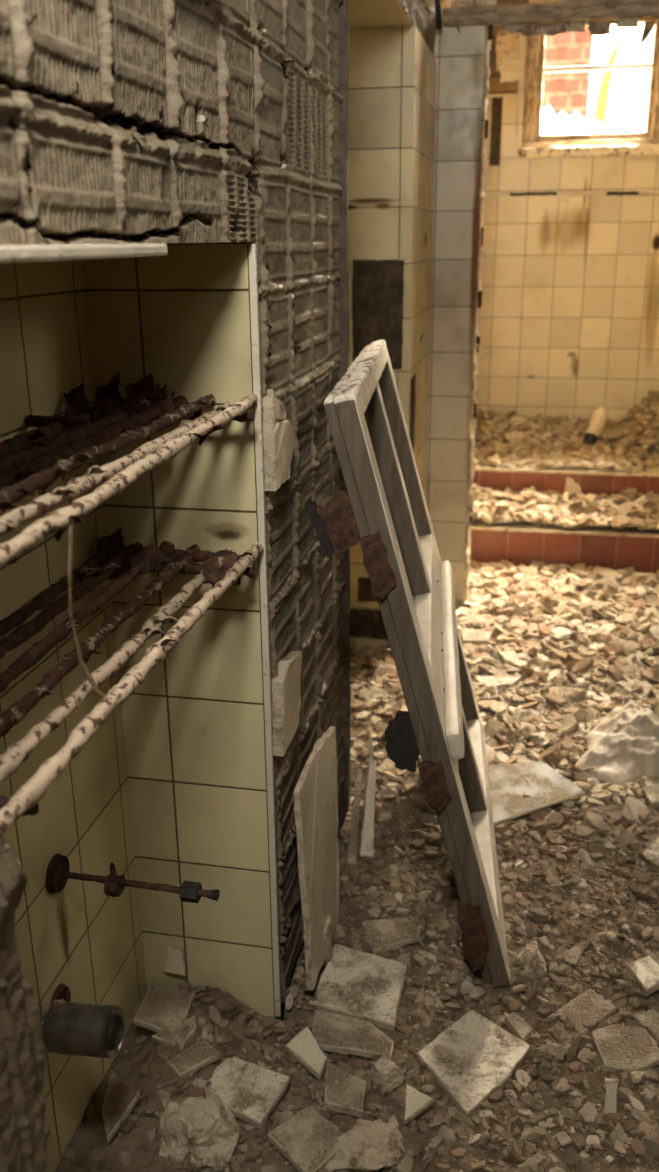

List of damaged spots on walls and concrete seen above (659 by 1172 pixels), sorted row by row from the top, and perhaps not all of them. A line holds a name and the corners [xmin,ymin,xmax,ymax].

crack [0,62,240,263]